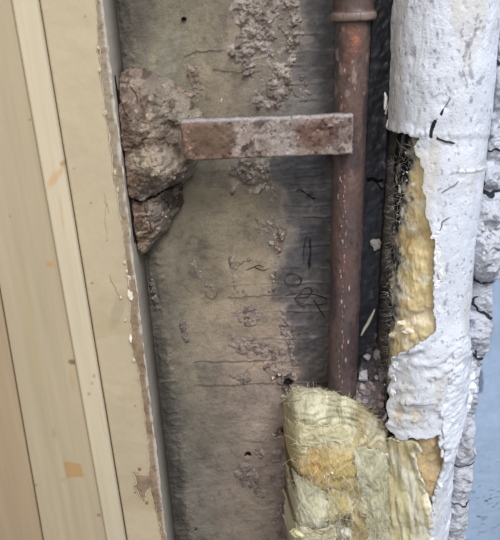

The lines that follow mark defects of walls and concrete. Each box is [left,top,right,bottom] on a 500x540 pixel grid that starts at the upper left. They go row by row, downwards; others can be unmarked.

spalling [227,0,311,113]
crack [429,98,455,144]
spalling [228,158,277,208]
leakage [270,155,333,387]
peeling [433,246,446,290]